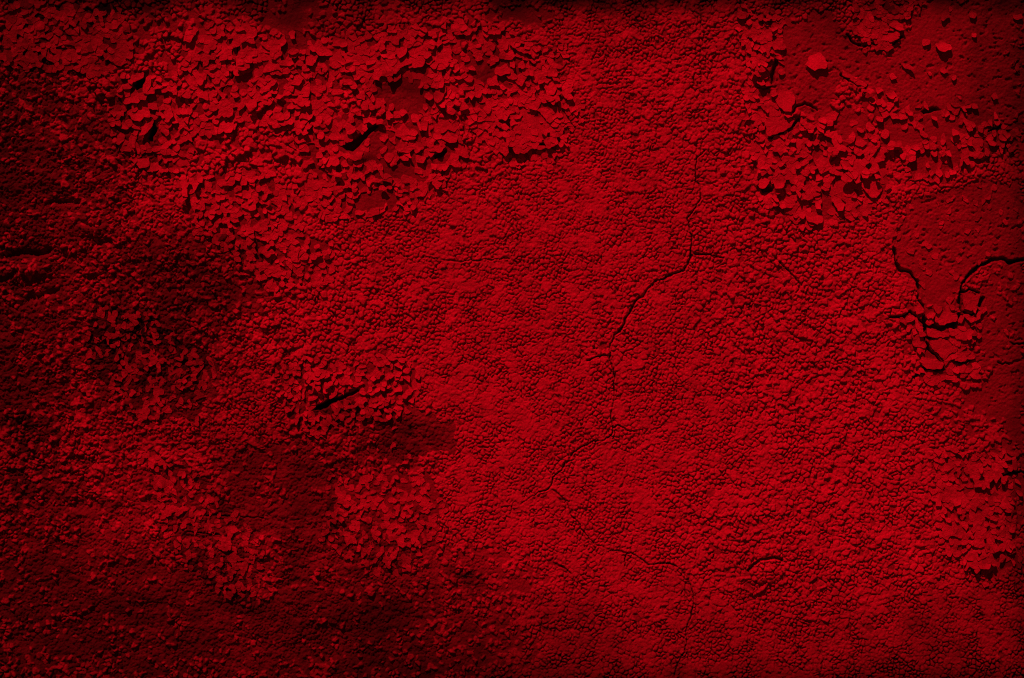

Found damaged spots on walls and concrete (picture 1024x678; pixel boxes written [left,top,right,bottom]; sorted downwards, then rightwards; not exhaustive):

peeling [0,0,587,292]
peeling [272,350,458,578]
crack [521,149,725,677]
peeling [732,0,1023,389]
crack [889,246,1024,378]
peeling [928,446,1024,589]